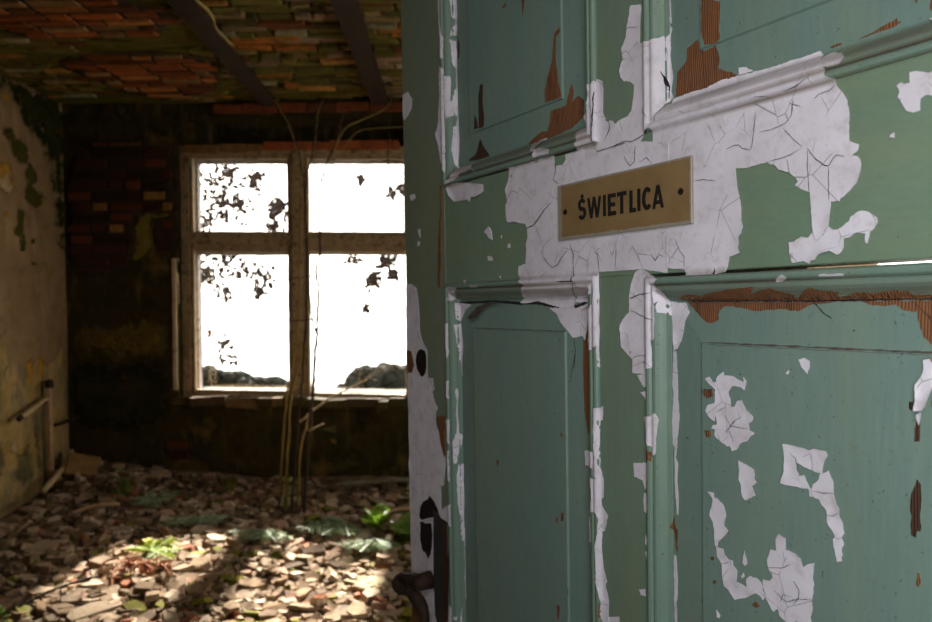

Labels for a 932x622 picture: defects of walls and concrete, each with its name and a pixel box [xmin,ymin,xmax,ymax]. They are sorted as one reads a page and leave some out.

spalling [0,0,181,39]
spalling [60,51,224,100]
peeling [402,92,412,120]
crack [727,77,844,193]
peeling [435,0,499,372]
spalling [150,218,180,254]
peeling [505,0,932,622]
crack [688,298,932,320]
peeling [403,284,465,574]
peeling [412,587,437,622]